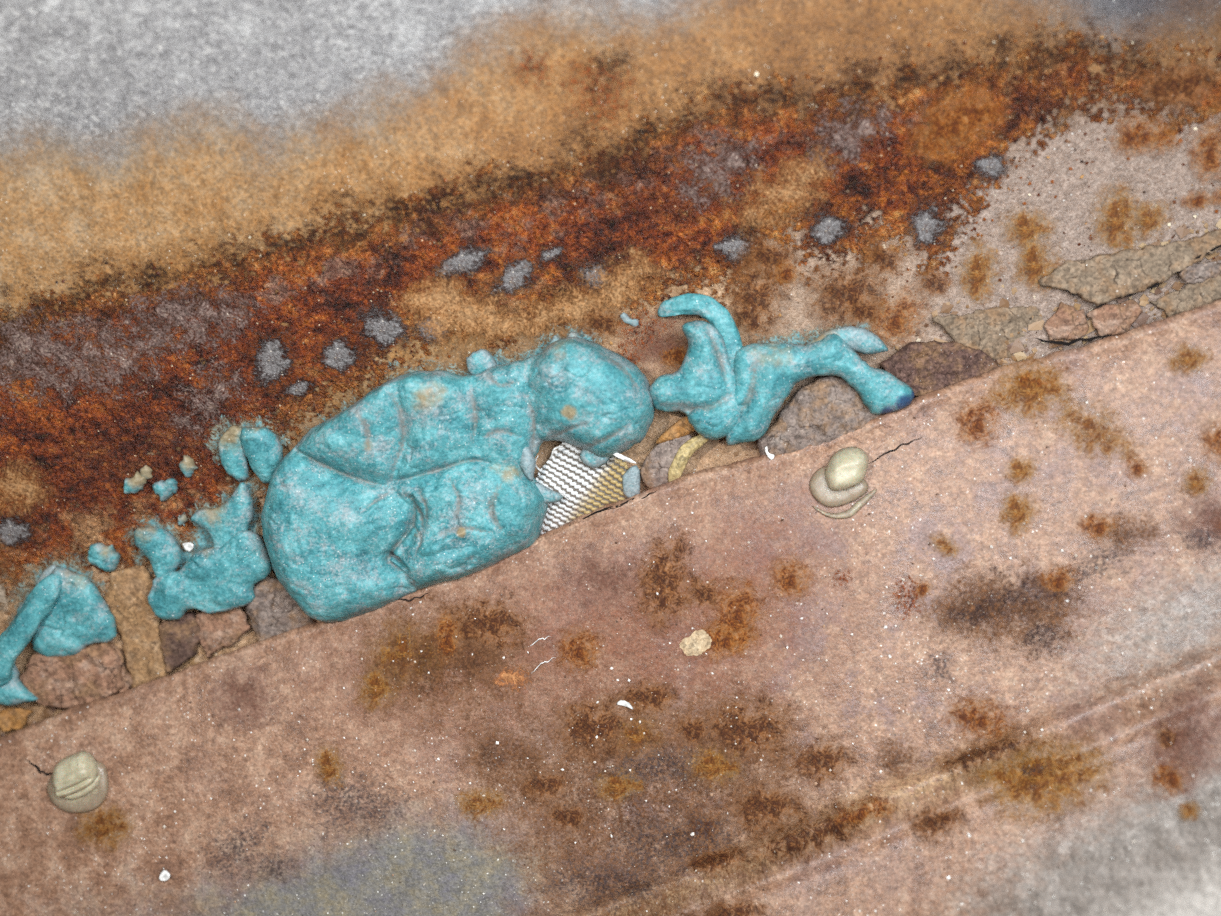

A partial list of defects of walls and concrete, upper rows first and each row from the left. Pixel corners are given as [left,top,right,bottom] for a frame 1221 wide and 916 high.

water stain [0,0,1221,369]
spalling [902,201,948,249]
spalling [972,147,1009,181]
water stain [264,280,614,448]
rust [0,8,1221,621]
peeling [932,229,1221,362]
crack [1035,245,1221,346]
peeling [103,565,252,693]
rust [577,533,811,659]
rust [893,510,1159,661]
rust [334,589,897,916]
rust [937,698,1111,822]